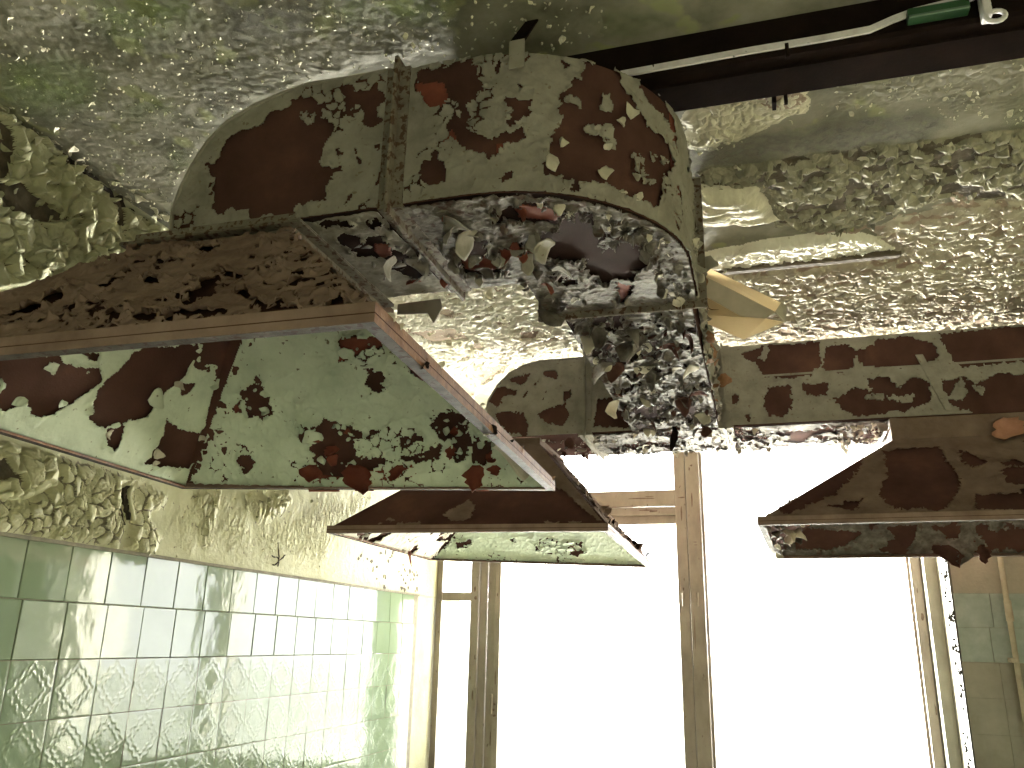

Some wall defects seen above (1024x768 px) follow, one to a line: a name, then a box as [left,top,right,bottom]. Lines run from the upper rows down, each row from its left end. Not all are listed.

peeling [0,71,388,290]
peeling [383,51,1024,463]
peeling [11,396,29,407]
peeling [148,381,185,410]
peeling [302,429,324,445]
spalling [0,459,21,486]
peeling [152,448,166,468]
peeling [317,454,356,466]
peeling [600,505,650,558]
peeling [770,525,807,559]